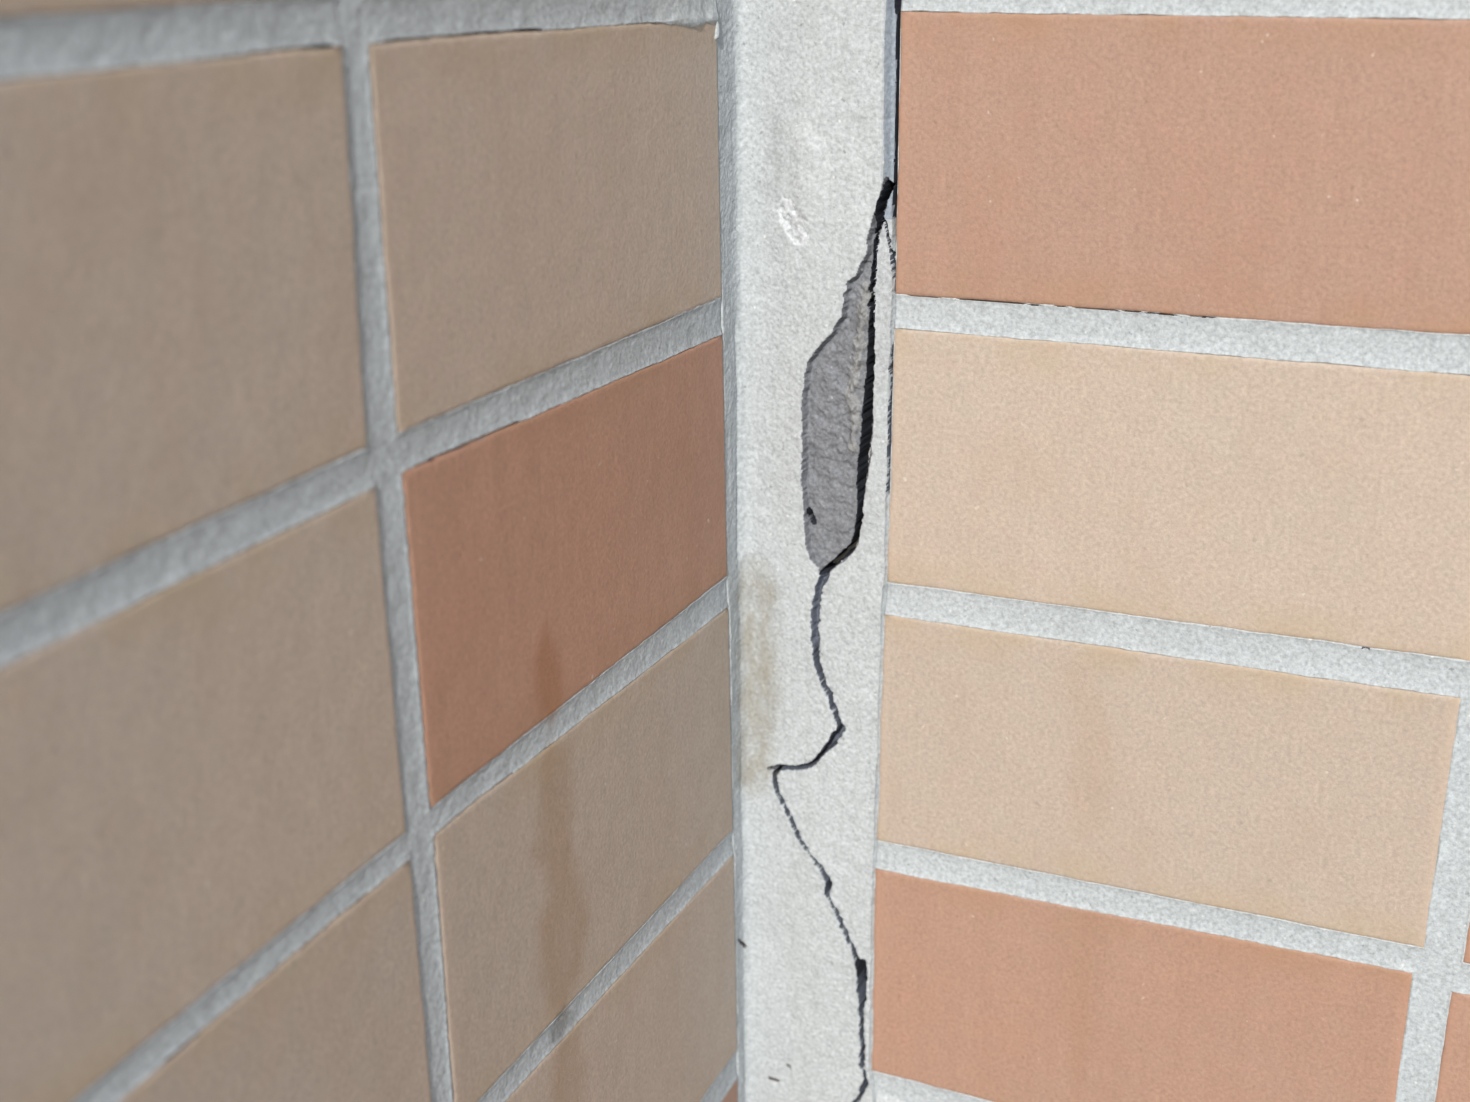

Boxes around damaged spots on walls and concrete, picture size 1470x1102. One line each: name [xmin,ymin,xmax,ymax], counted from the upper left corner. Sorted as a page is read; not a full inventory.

spalling [800,177,897,576]
crack [767,572,869,1102]